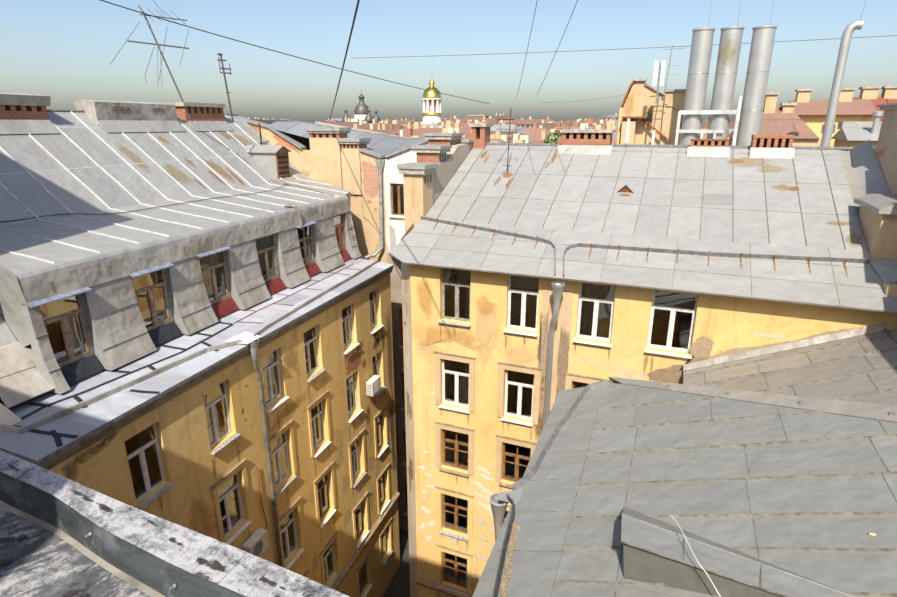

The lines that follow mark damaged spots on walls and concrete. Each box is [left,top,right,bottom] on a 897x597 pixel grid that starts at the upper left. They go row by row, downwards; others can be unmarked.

rust [168,166,205,188]
rust [206,161,243,184]
rust [731,158,780,172]